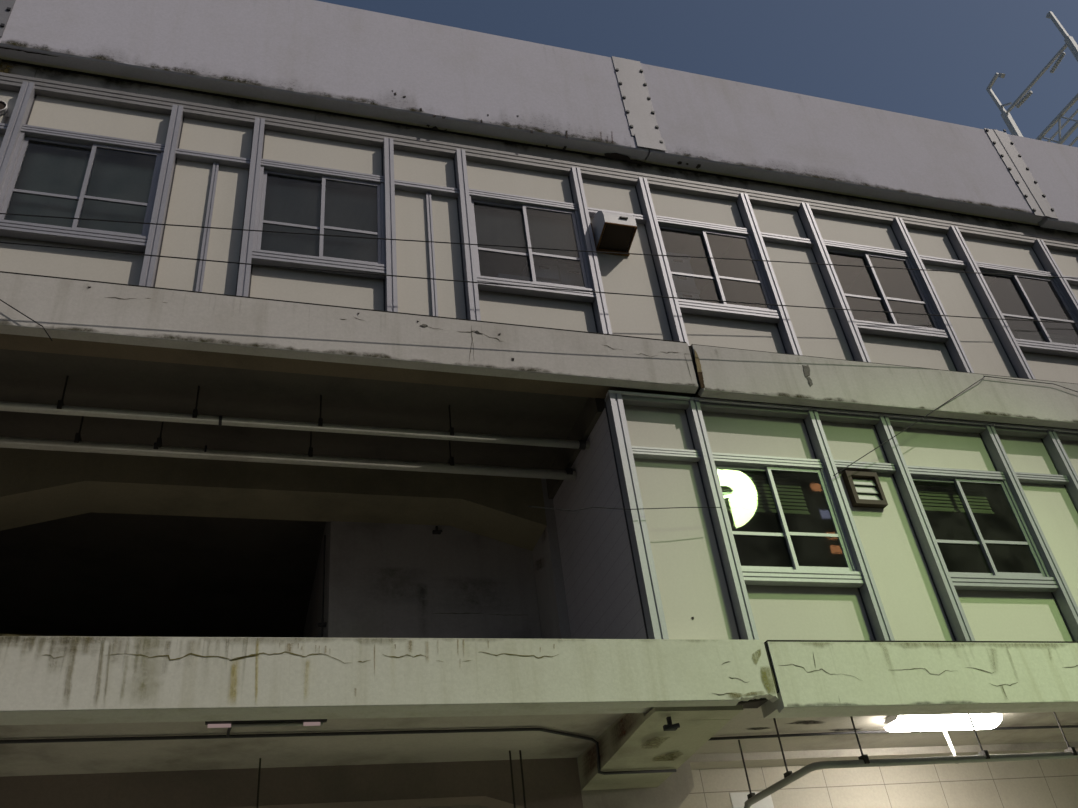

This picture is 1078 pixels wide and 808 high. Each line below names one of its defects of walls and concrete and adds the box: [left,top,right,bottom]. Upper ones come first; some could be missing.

crack [111,652,556,663]
crack [903,667,1018,699]